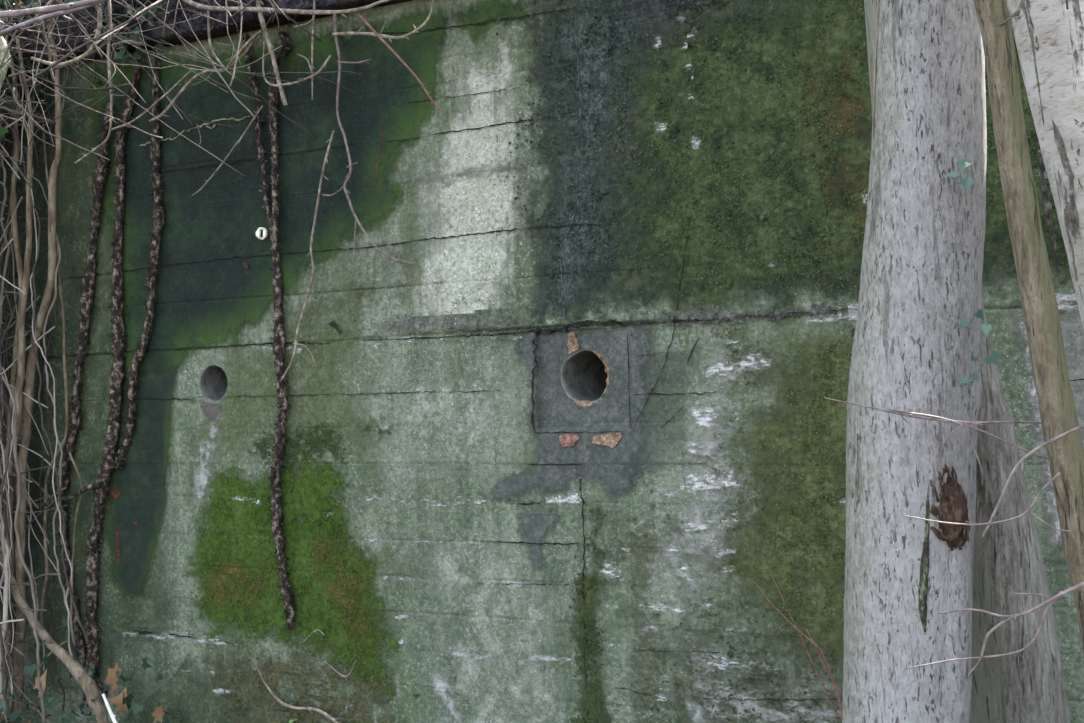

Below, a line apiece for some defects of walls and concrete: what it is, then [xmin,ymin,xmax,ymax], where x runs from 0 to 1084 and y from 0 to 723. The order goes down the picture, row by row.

crack [29,4,858,434]
damp [411,42,528,317]
damp [108,367,176,598]
damp [372,363,501,473]
spalling [559,433,579,447]
spalling [591,432,622,448]
damp [460,325,771,625]
crack [134,630,234,644]
damp [416,536,573,723]
crack [474,463,590,714]
crack [639,647,720,655]
crack [691,695,842,703]